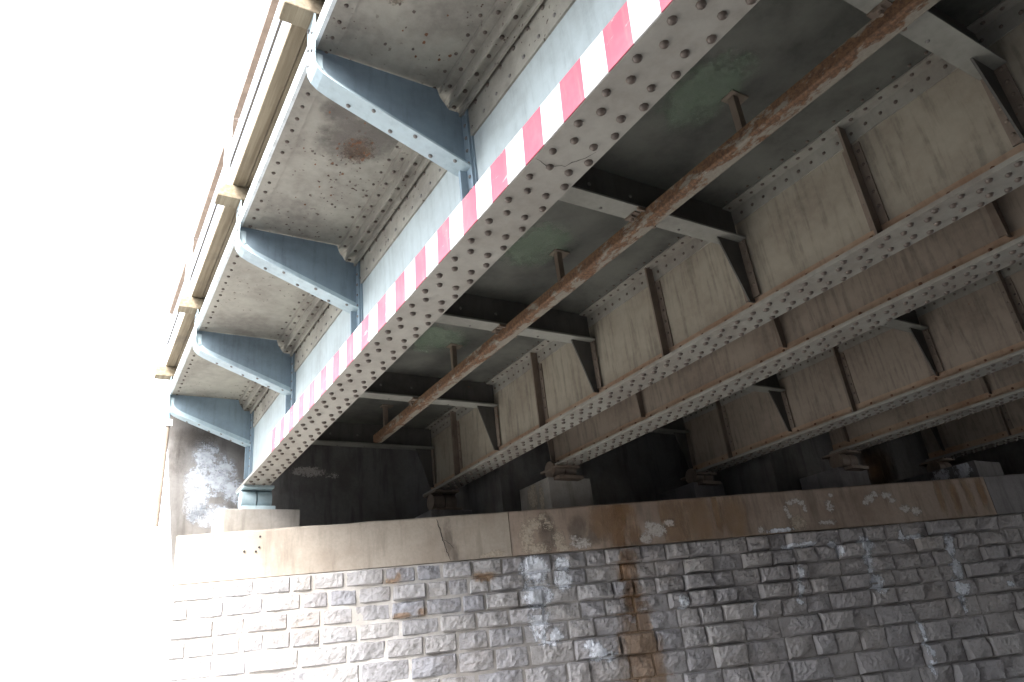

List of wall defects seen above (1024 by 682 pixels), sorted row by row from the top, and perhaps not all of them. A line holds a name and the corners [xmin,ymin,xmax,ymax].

water stain [780,540,845,558]
water stain [519,555,572,647]
rust [593,504,666,682]
water stain [677,595,690,610]
water stain [796,565,805,605]
water stain [944,533,971,613]
water stain [584,639,619,663]